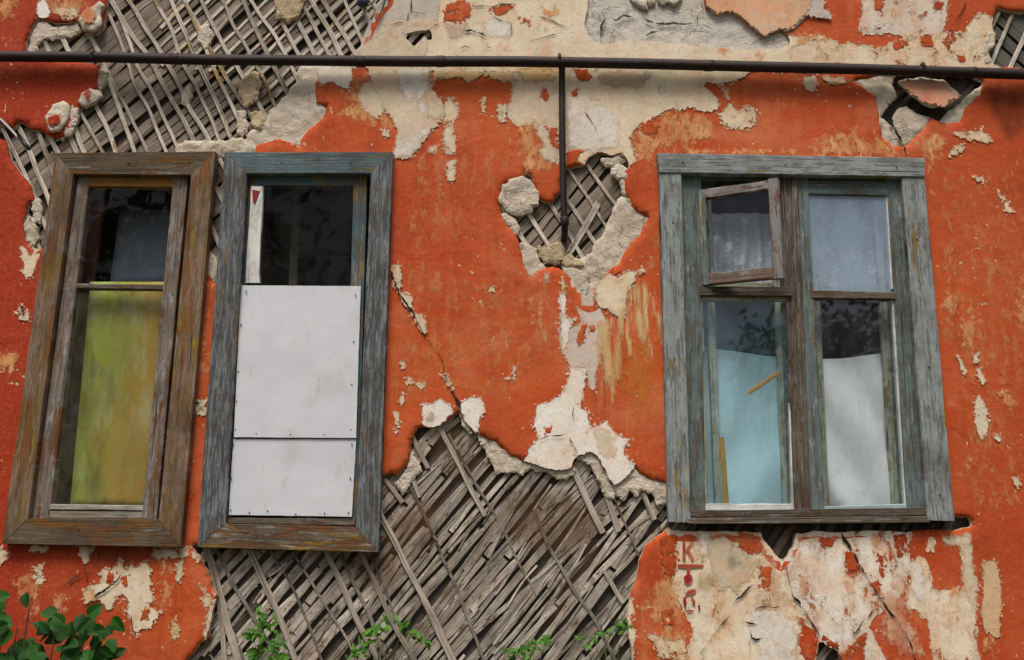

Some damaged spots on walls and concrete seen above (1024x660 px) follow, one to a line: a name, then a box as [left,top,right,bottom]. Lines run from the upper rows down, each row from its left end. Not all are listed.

peeling [0,0,18,16]
peeling [27,0,1024,169]
spalling [0,62,559,288]
crack [391,272,461,409]
spalling [150,68,1004,660]
peeling [14,544,49,615]
peeling [78,545,96,567]
peeling [81,557,163,639]
crack [841,533,916,660]